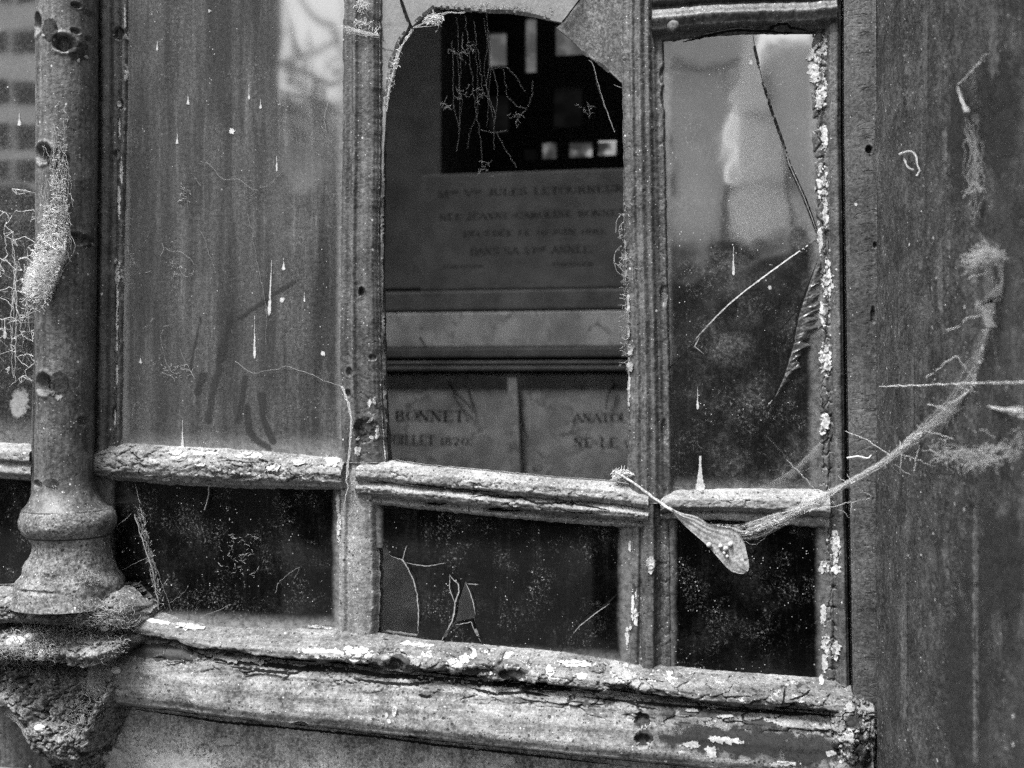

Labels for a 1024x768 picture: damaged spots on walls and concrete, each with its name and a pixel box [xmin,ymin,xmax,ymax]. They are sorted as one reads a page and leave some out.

peeling [768,35,835,406]
peeling [819,413,831,435]
peeling [646,557,656,574]
peeling [298,640,434,670]
spalling [446,649,591,684]
peeling [596,589,650,698]
spalling [679,708,737,720]
spalling [826,695,877,768]
peeling [680,736,749,762]